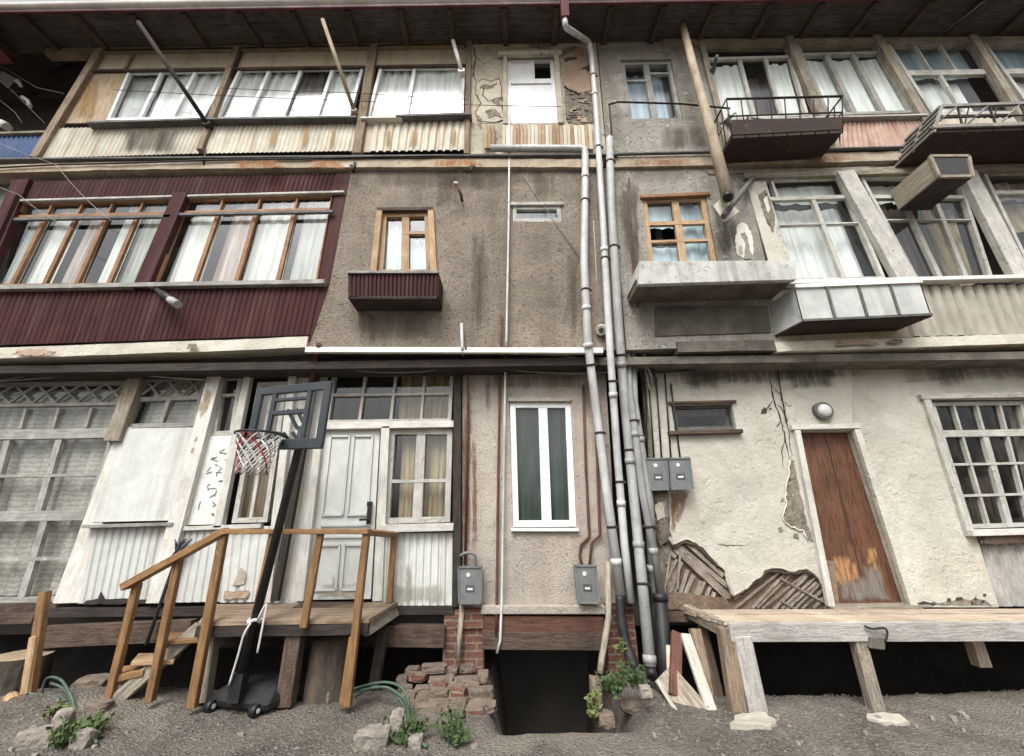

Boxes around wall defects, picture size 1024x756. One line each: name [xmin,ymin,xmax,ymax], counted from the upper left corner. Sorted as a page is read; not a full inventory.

flaking render [474,78,503,123]
flaking render [559,43,594,125]
peeling [735,223,754,259]
crack [762,371,792,468]
flaking render [778,460,813,542]
flaking render [664,537,826,611]